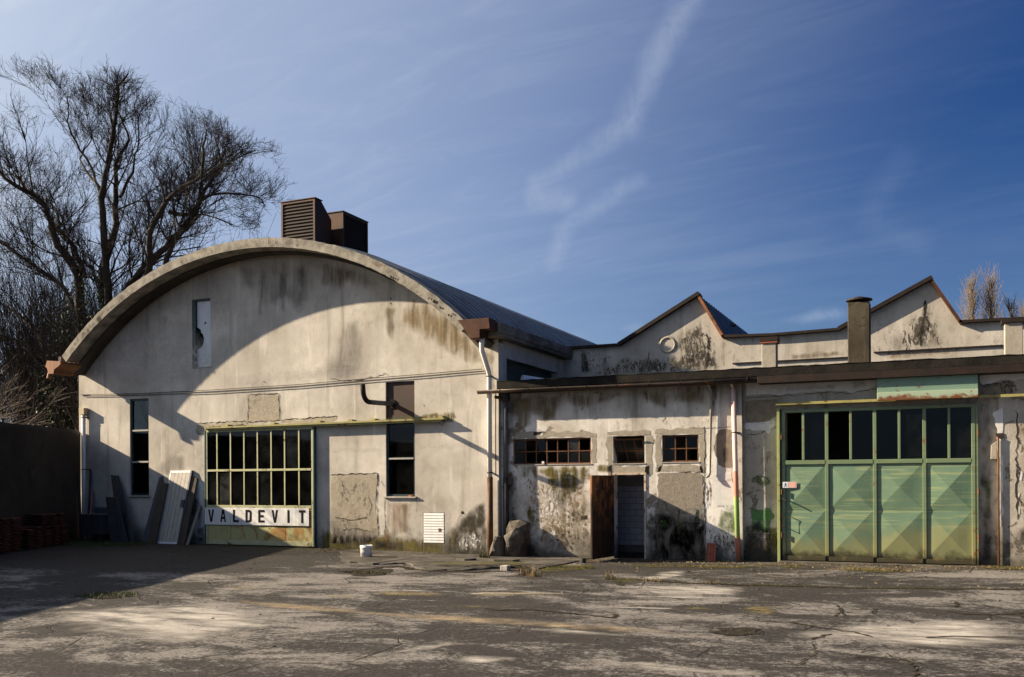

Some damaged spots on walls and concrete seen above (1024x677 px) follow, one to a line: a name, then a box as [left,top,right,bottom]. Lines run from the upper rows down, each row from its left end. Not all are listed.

water stain [408,311,476,357]
flaking render [196,393,337,434]
water stain [548,466,584,488]
crack [1003,410,1022,527]
flaking render [331,473,380,543]
water stain [447,505,486,554]
water stain [648,515,705,561]